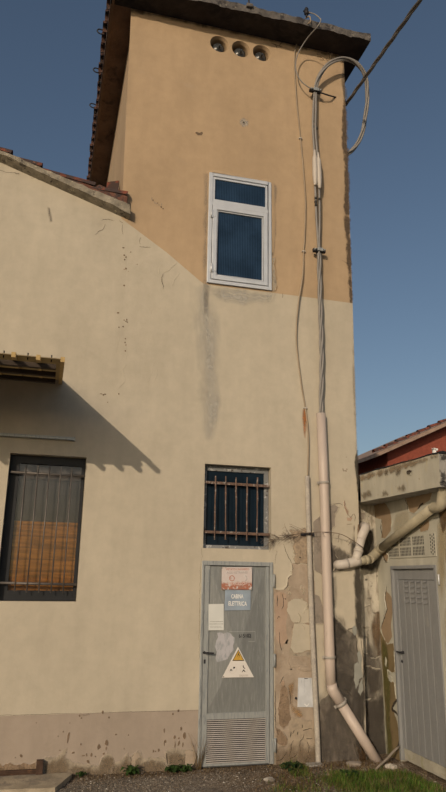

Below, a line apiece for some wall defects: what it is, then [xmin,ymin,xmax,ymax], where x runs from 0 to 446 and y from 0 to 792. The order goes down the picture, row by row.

leakage [355,451,432,498]
peeling [405,492,433,514]
flaking render [274,500,392,765]
leakage [331,529,386,754]
peeling [380,586,401,761]
spalling [0,714,197,776]
leakage [319,693,365,762]